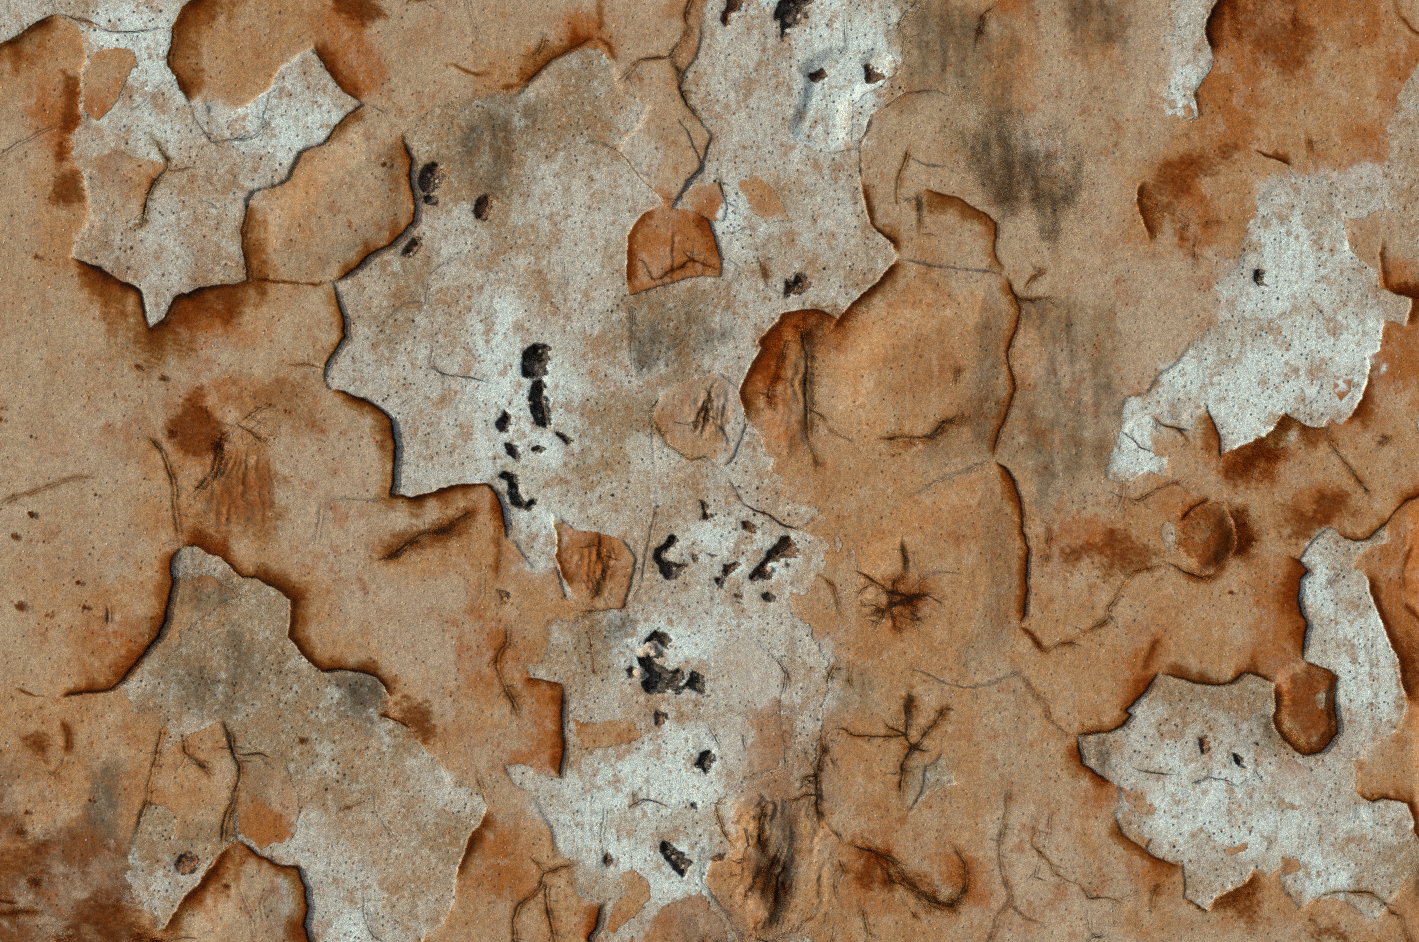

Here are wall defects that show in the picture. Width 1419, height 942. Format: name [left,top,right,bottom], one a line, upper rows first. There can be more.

peeling [0,0,362,327]
peeling [1157,0,1217,119]
peeling [1105,63,1419,482]
corrosion [0,810,47,887]
peeling [115,546,489,942]
peeling [325,0,920,942]
crack [600,792,669,855]
crack [823,540,953,688]
crack [696,563,1208,942]
peeling [1161,518,1211,555]
crack [1135,768,1265,789]
peeling [1077,524,1418,918]